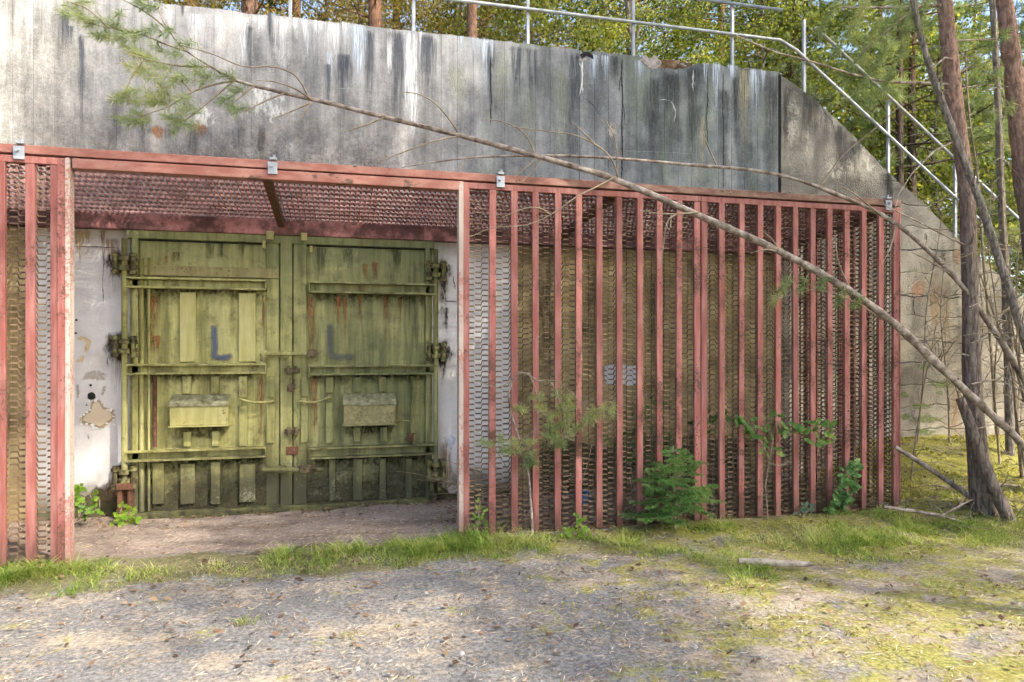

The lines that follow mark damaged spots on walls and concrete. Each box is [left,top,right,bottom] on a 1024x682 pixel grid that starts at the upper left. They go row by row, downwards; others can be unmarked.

water stain [166,5,223,37]
water stain [61,14,84,92]
water stain [239,13,374,94]
water stain [387,29,435,114]
water stain [460,36,536,88]
water stain [570,55,580,110]
water stain [592,54,618,79]
spalling [640,55,693,70]
water stain [647,63,738,158]
rust [144,292,160,349]
peeling [79,398,115,429]